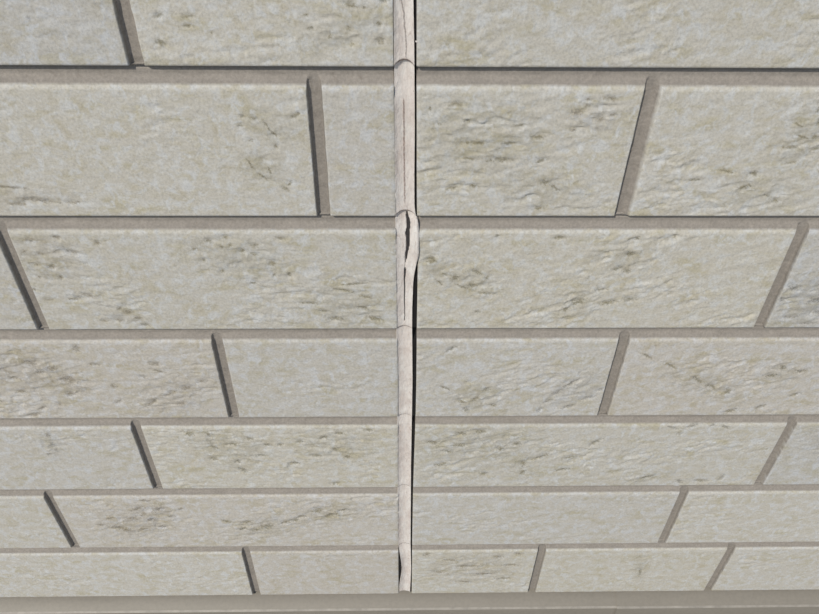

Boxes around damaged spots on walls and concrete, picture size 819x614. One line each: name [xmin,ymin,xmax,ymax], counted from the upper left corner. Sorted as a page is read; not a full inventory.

crack [398,0,418,592]